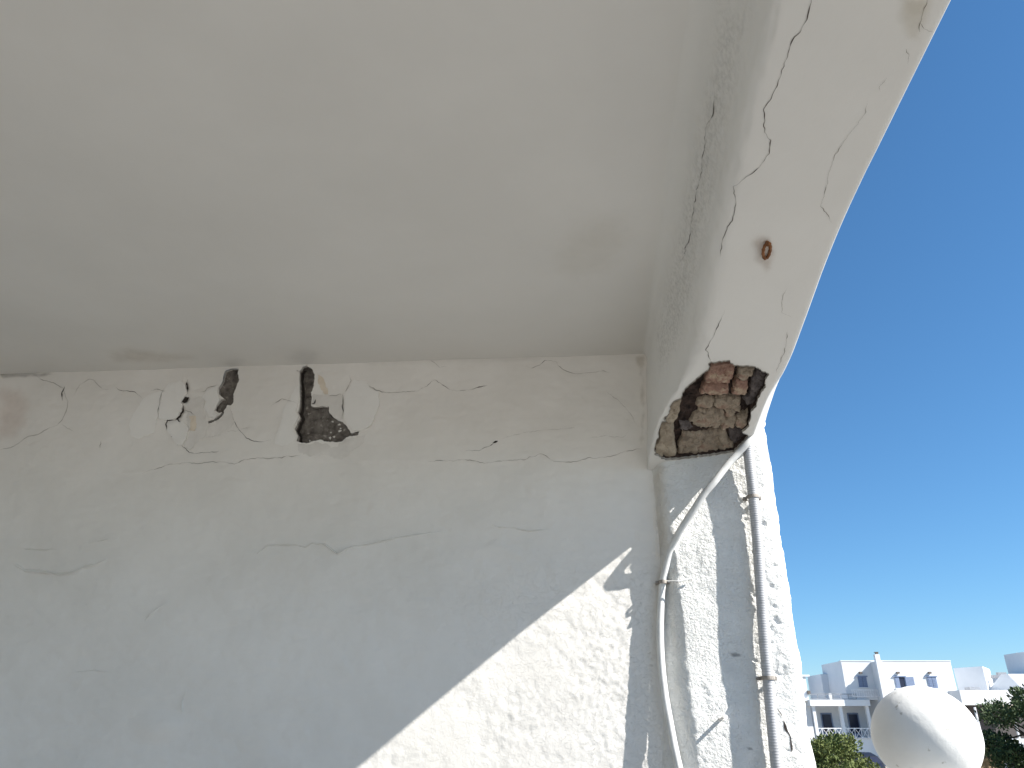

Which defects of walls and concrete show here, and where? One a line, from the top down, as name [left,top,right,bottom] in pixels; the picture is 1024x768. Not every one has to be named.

crack [720,4,811,252]
peeling [129,369,239,454]
peeling [274,366,380,460]
spalling [654,360,769,460]